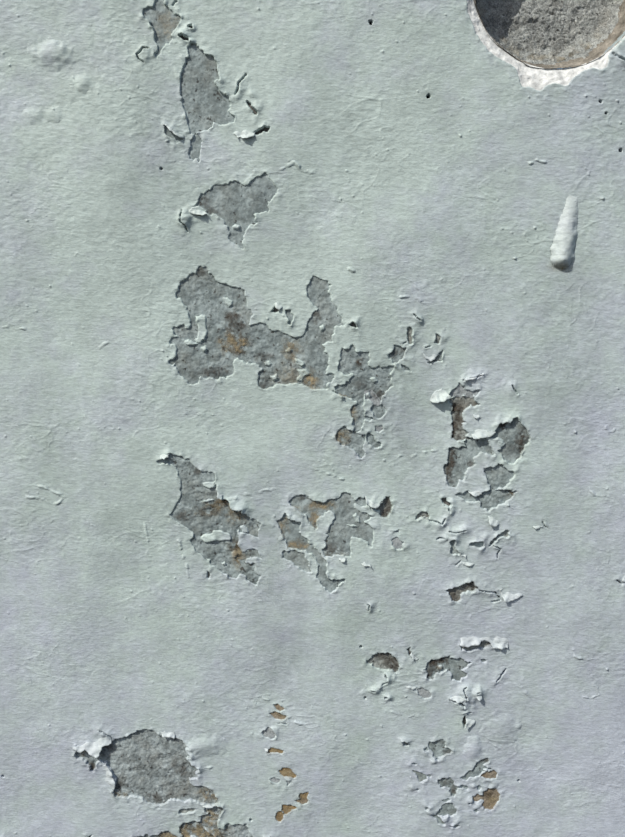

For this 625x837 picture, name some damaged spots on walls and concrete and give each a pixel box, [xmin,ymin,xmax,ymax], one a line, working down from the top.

peeling [143,0,181,57]
peeling [164,44,269,162]
peeling [189,173,278,249]
peeling [169,266,412,458]
peeling [430,373,530,527]
peeling [157,453,261,585]
peeling [277,492,392,593]
peeling [447,581,477,601]
peeling [367,653,399,672]
peeling [410,636,509,681]
peeling [72,729,253,837]
peeling [413,758,497,816]